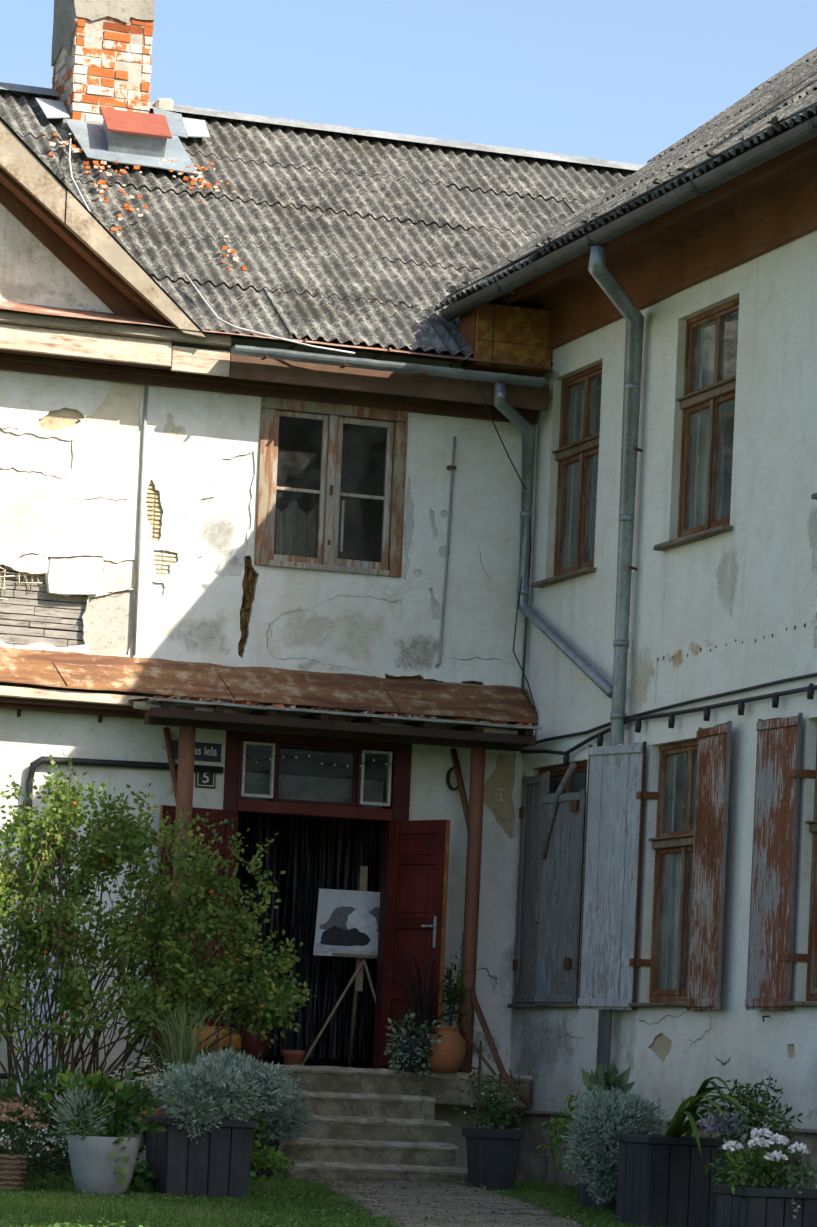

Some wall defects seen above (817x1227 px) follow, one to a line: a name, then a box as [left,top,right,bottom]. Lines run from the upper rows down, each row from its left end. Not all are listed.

crack [0,467,138,502]
flaking render [146,480,179,601]
peeling [182,451,259,658]
flaking render [0,553,136,656]
crack [267,626,372,675]
flaking render [484,753,516,839]
flaking render [648,1033,672,1063]